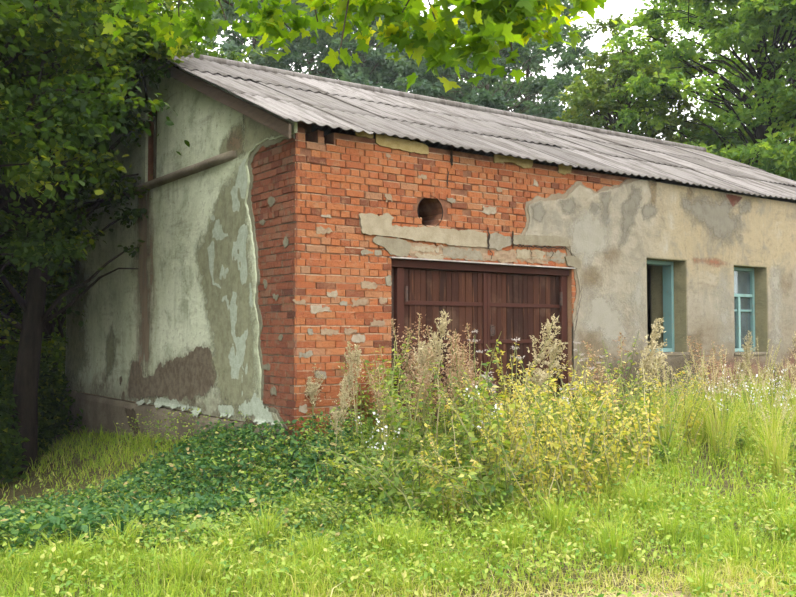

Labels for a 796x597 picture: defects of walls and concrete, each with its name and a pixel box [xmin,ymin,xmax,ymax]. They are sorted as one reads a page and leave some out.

leakage [106,326,116,376]
flaking render [119,132,623,446]